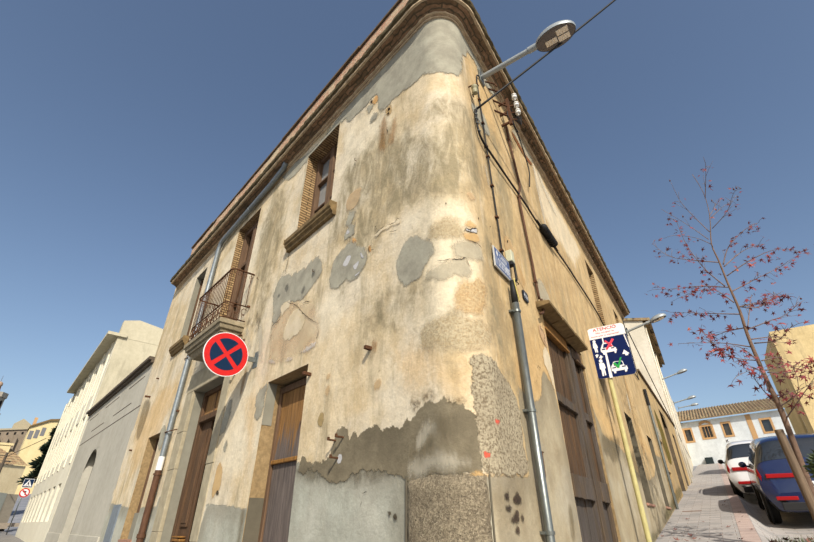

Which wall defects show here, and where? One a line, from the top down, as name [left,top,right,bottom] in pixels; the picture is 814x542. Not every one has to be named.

peeling [367,96,390,122]
flaking render [298,218,529,484]
leakage [505,492,524,534]